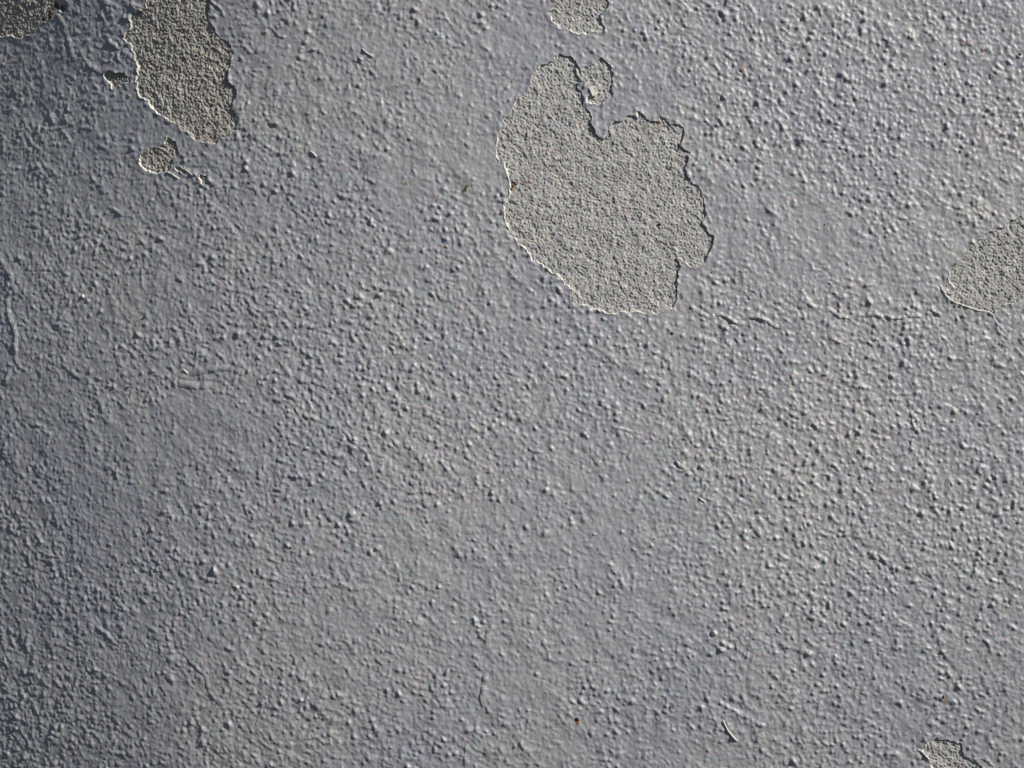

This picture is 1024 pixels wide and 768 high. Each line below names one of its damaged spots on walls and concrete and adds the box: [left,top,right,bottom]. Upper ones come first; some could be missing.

peeling [0,0,69,40]
peeling [547,0,610,36]
peeling [103,0,239,186]
peeling [495,53,715,316]
peeling [939,213,1024,320]
peeling [921,737,983,768]